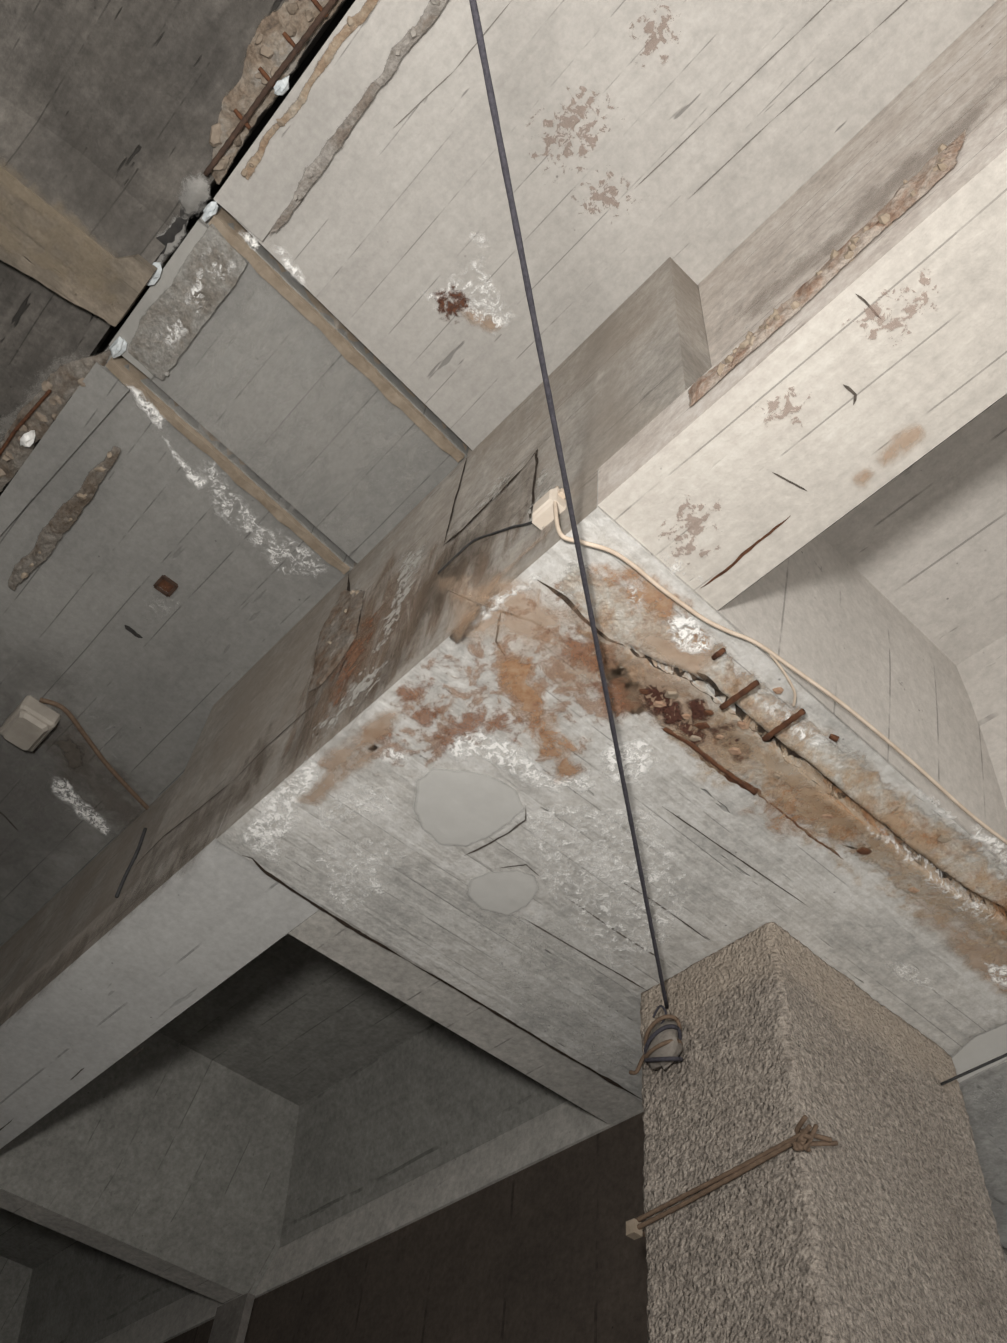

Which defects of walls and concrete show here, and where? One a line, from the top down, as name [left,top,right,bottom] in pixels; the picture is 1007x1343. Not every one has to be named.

spalling [203,0,379,184]
spalling [270,0,448,233]
spalling [128,224,247,380]
water stain [428,262,508,328]
spalling [0,351,112,492]
water stain [129,387,320,572]
crack [444,449,538,544]
water stain [52,778,110,834]
water stain [243,548,427,860]
water stain [448,730,593,791]
rust [304,552,753,802]
spalling [555,562,1007,952]